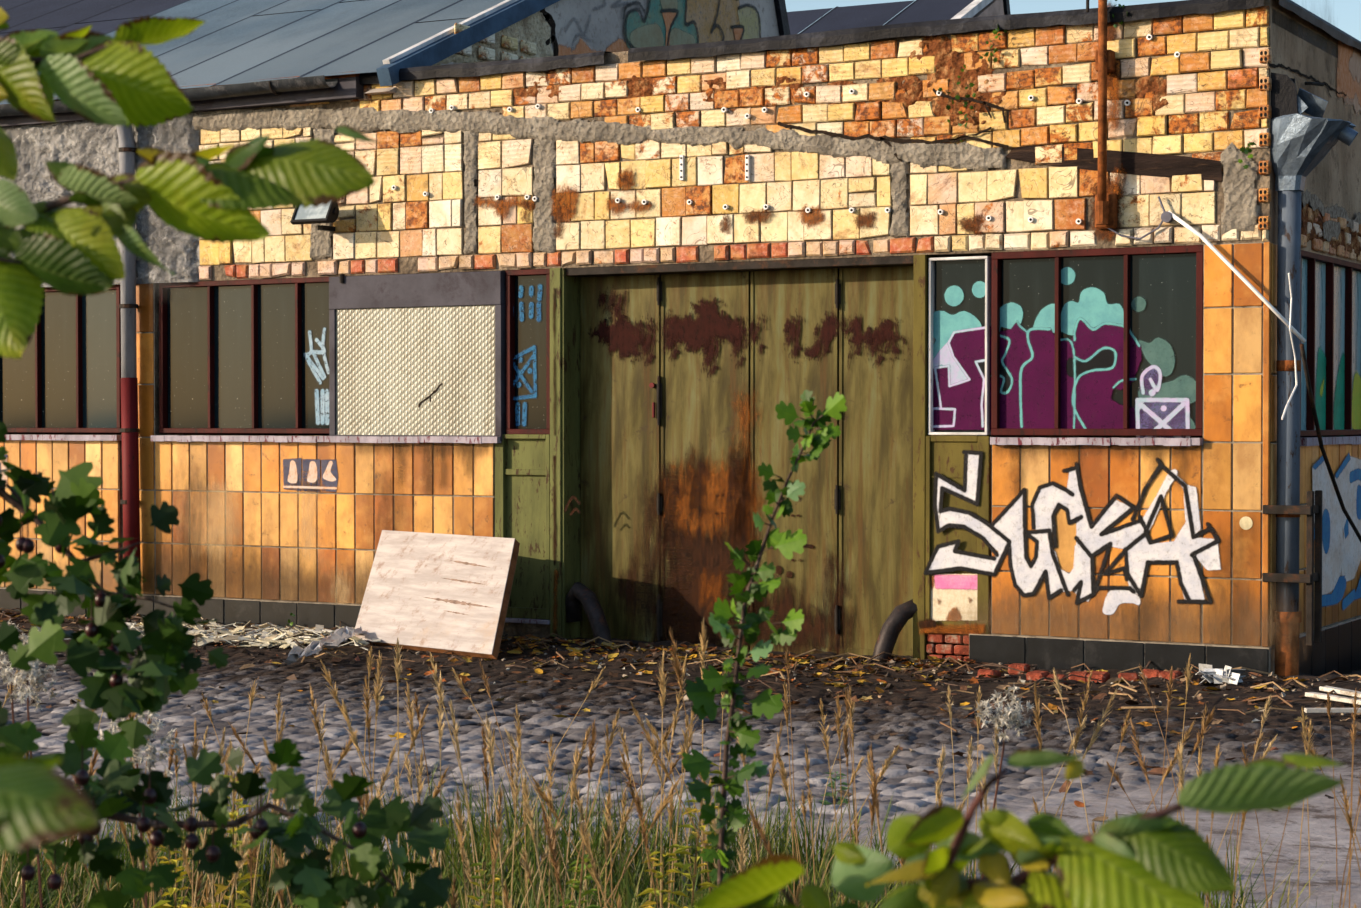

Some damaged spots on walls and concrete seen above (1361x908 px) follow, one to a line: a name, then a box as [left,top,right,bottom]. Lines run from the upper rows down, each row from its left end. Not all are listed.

crack [540,8,559,56]
peeling [1336,40,1361,114]
rust [475,195,535,222]
rust [551,185,578,237]
rust [606,169,652,214]
rust [719,208,774,234]
rust [798,205,825,227]
rust [853,212,876,229]
spalling [1301,190,1361,262]
rust [588,285,768,382]
rust [783,307,910,368]
rust [616,397,854,654]